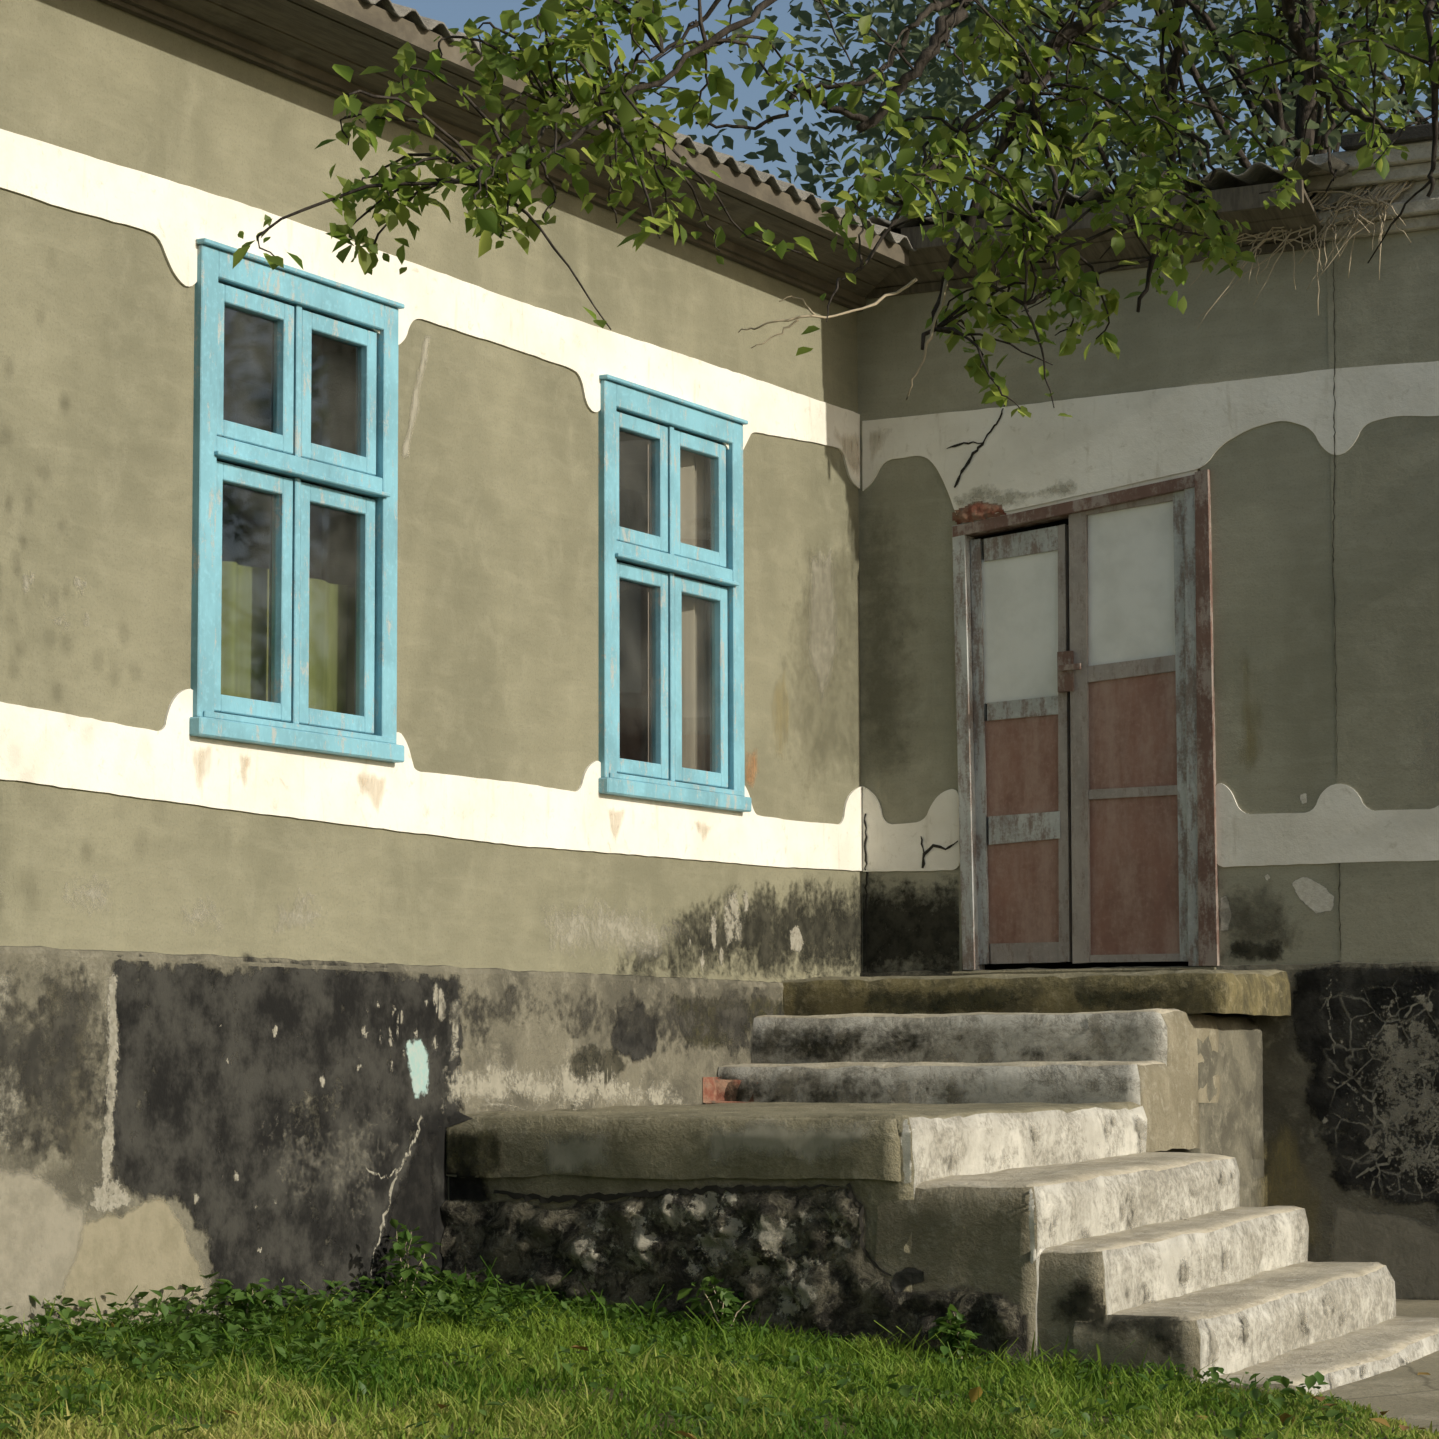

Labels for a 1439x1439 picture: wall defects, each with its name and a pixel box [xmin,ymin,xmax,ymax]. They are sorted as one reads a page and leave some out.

crack [1331,261,1339,772]
crack [862,814,870,971]
crack [921,837,958,868]
peeling [1292,877,1334,914]
leakage [0,878,1014,1314]
crack [1326,863,1439,1199]
crack [366,1116,422,1271]